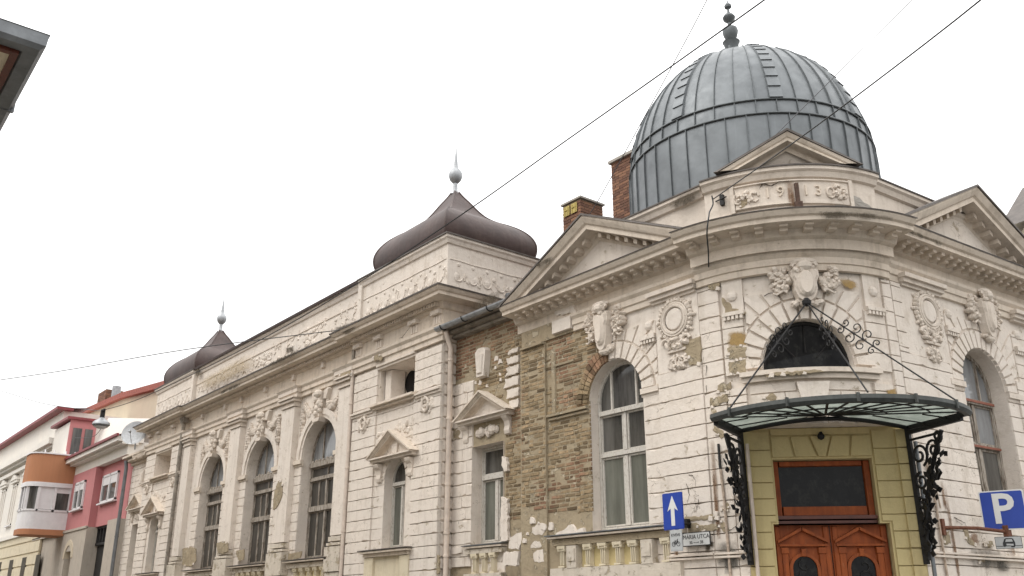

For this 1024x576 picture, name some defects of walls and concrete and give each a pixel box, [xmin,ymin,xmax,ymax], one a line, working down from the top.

spalling [456,320,609,567]
spalling [710,344,747,439]